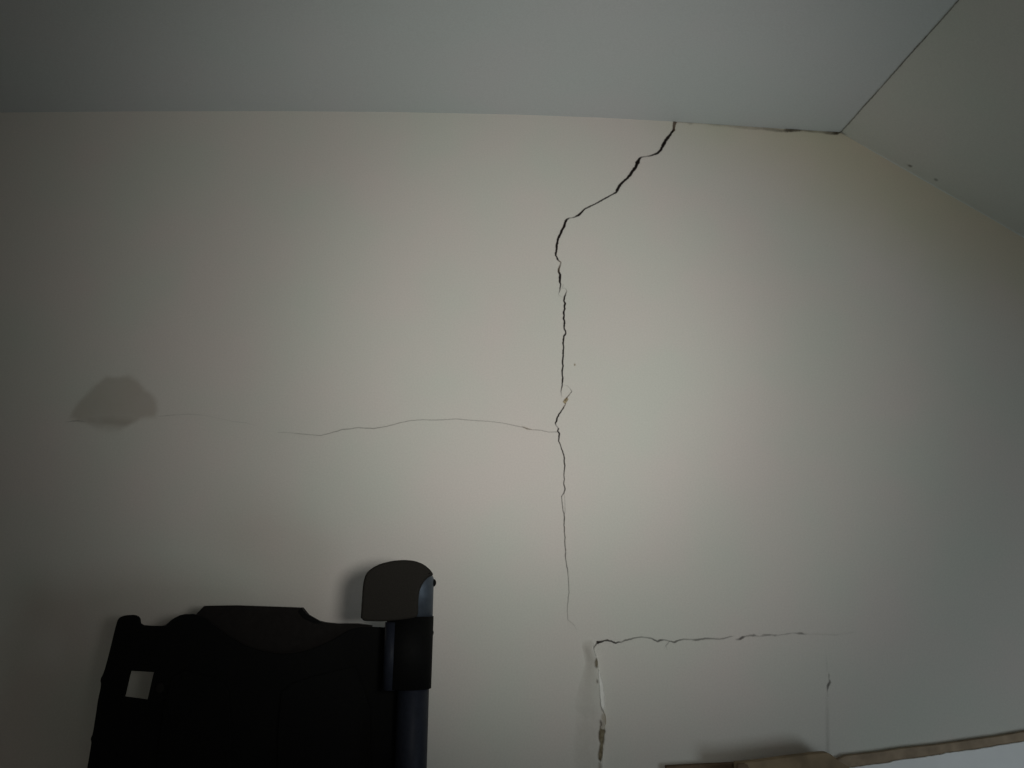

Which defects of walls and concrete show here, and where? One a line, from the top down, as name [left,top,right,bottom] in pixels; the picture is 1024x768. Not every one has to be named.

crack [555,121,677,570]